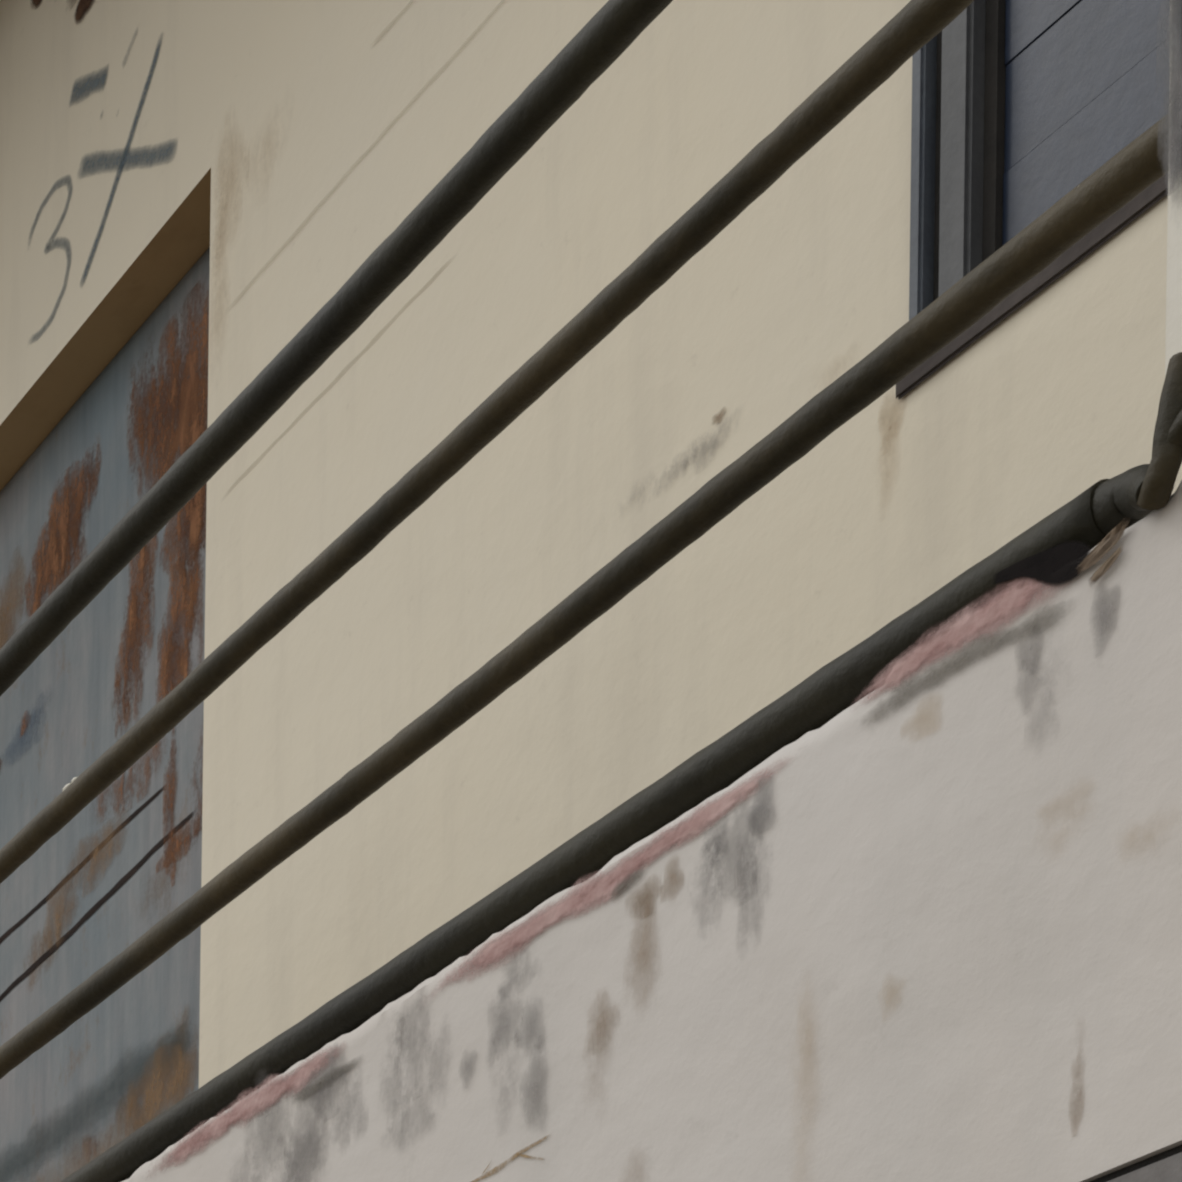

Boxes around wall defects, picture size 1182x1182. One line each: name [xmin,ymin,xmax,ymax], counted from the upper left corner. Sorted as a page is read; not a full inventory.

rust [130,297,209,488]
rust [26,465,99,613]
rust [114,483,207,723]
spalling [867,520,1127,717]
rust [99,744,203,879]
spalling [446,770,771,981]
spalling [163,1053,354,1166]